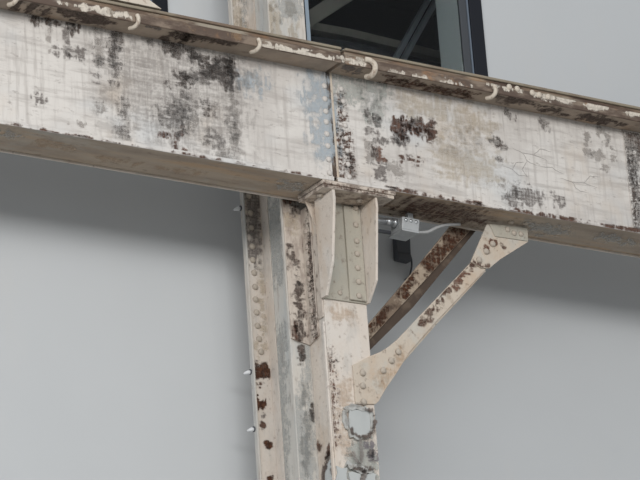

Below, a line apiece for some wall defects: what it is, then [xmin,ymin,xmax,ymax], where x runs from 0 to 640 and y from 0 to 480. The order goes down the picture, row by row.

damp [228,85,241,151]
rust [335,93,356,178]
peeling [534,92,576,104]
peeling [583,103,609,111]
rust [368,307,389,332]
rust [396,227,468,299]
rust [418,261,490,326]
rust [255,360,270,428]
peeling [317,356,379,480]